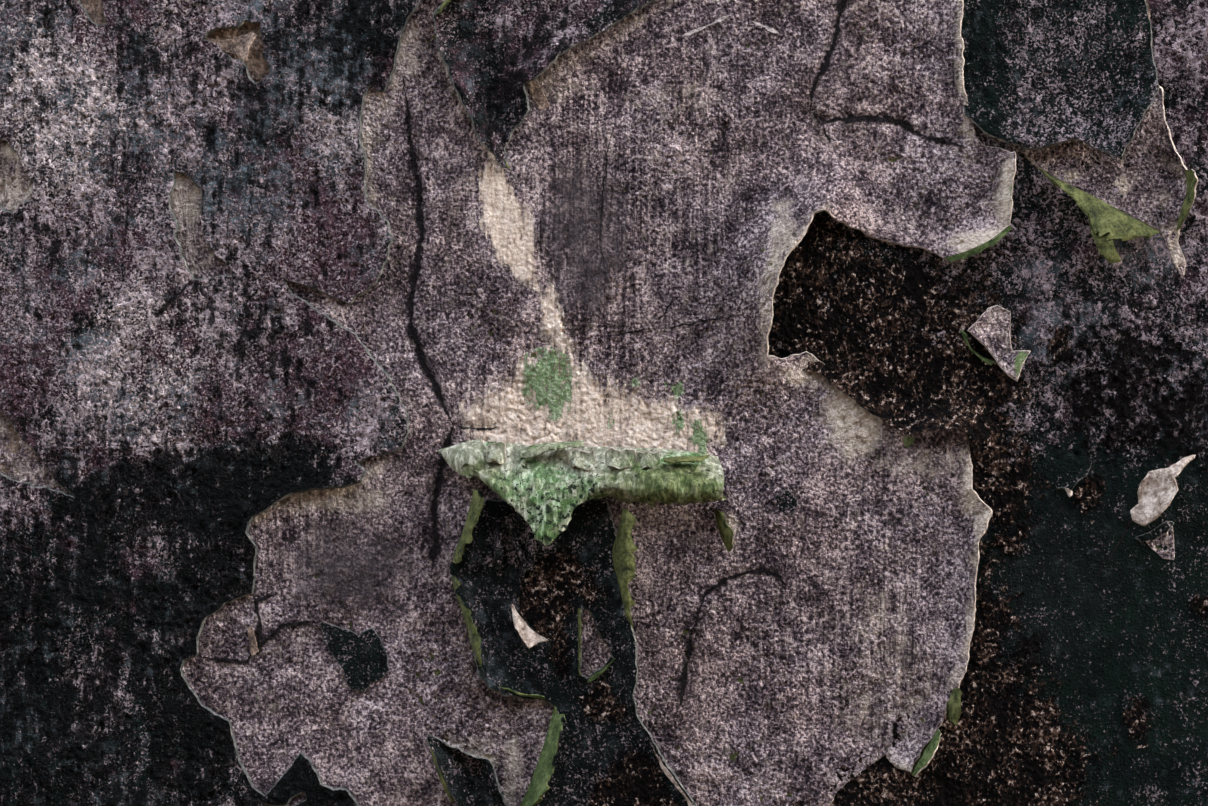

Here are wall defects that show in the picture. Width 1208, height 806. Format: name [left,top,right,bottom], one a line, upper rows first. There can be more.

crack [809,0,967,148]
flaking render [1010,86,1198,277]
peeling [0,0,421,806]
flaking render [183,0,1016,806]
peeling [960,305,1031,381]
peeling [1056,460,1092,497]
peeling [1130,455,1196,560]